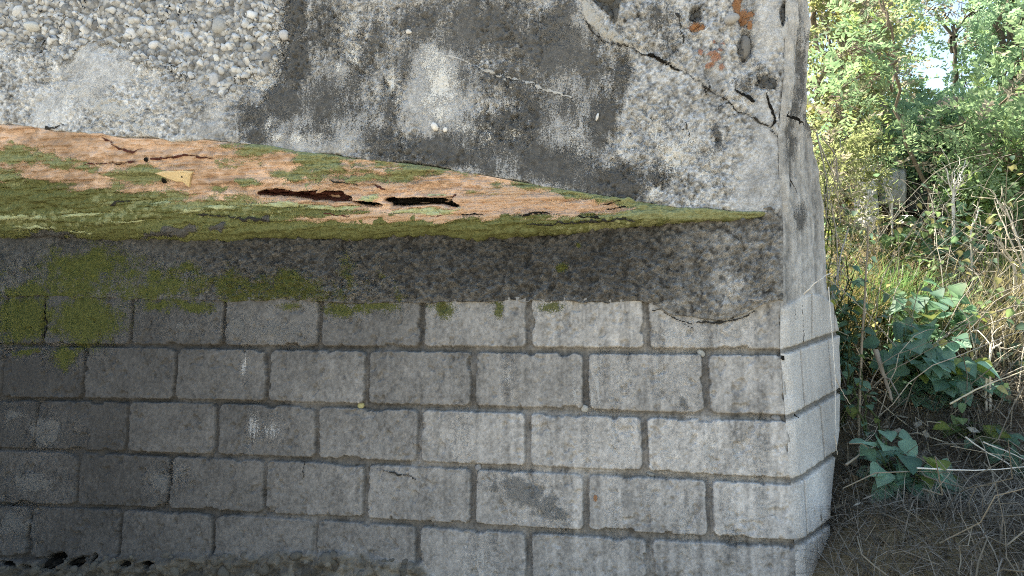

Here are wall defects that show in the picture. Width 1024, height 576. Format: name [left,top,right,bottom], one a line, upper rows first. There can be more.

rust [687,22,705,32]
rust [733,0,755,30]
rust [698,40,725,70]
crack [583,12,804,137]
water stain [229,0,723,206]
water stain [0,214,92,239]
water stain [111,204,241,239]
water stain [256,194,379,222]
water stain [390,194,460,216]
water stain [490,476,566,521]